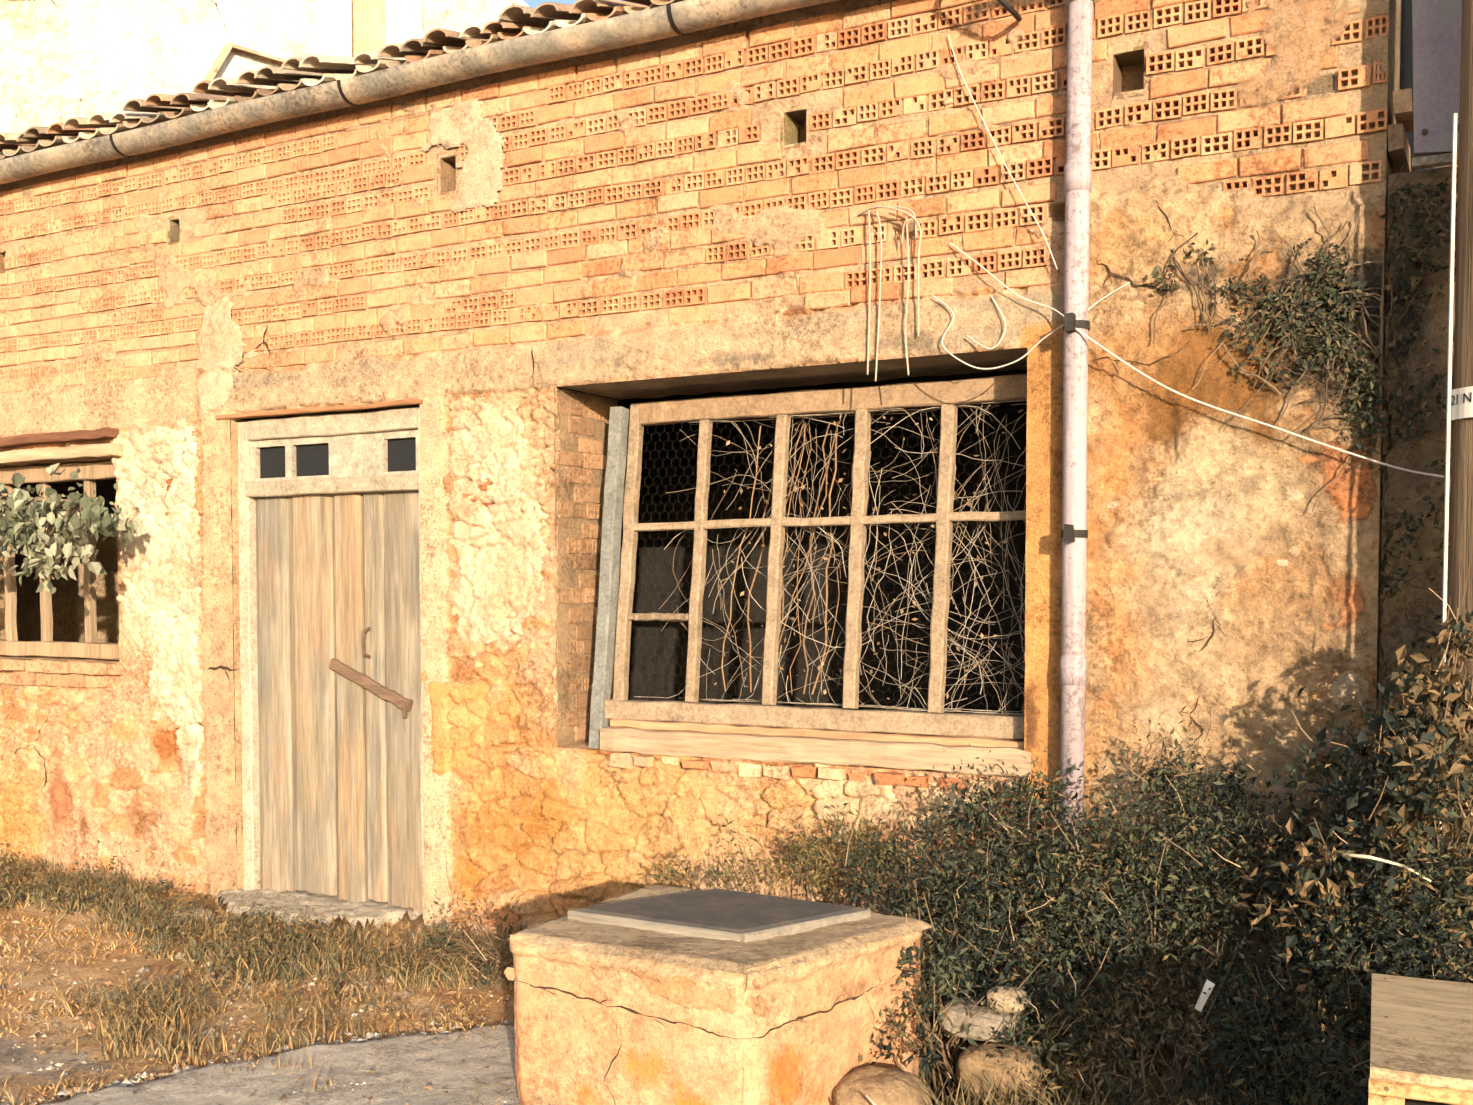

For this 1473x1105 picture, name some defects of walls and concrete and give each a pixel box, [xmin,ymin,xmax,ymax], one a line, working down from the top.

peeling [421,98,506,213]
crack [1096,260,1168,291]
spalling [1298,441,1376,521]
spalling [1322,578,1365,630]
crack [514,975,896,1103]